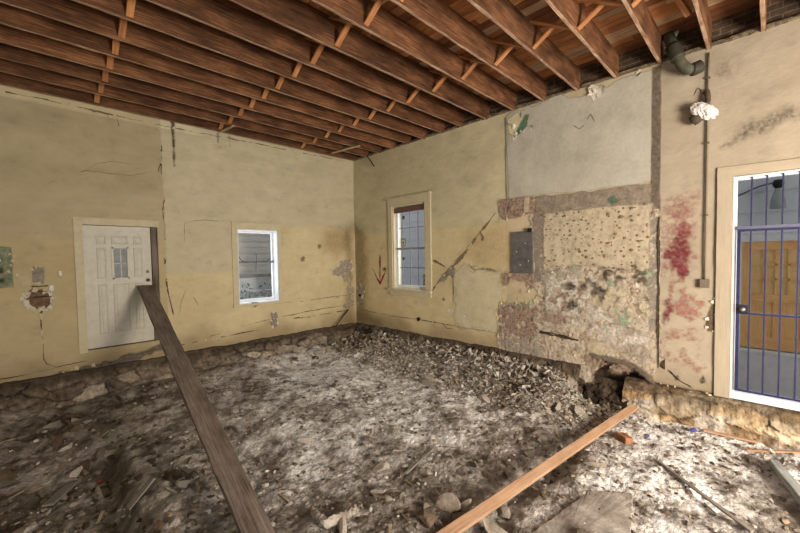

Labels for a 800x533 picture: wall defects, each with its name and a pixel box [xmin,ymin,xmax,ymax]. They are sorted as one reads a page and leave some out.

spalling [0,247,19,288]
spalling [20,264,57,314]
crack [5,91,346,315]
peeling [332,259,365,307]
crack [432,215,497,294]
spalling [447,69,665,386]
crack [2,311,85,379]